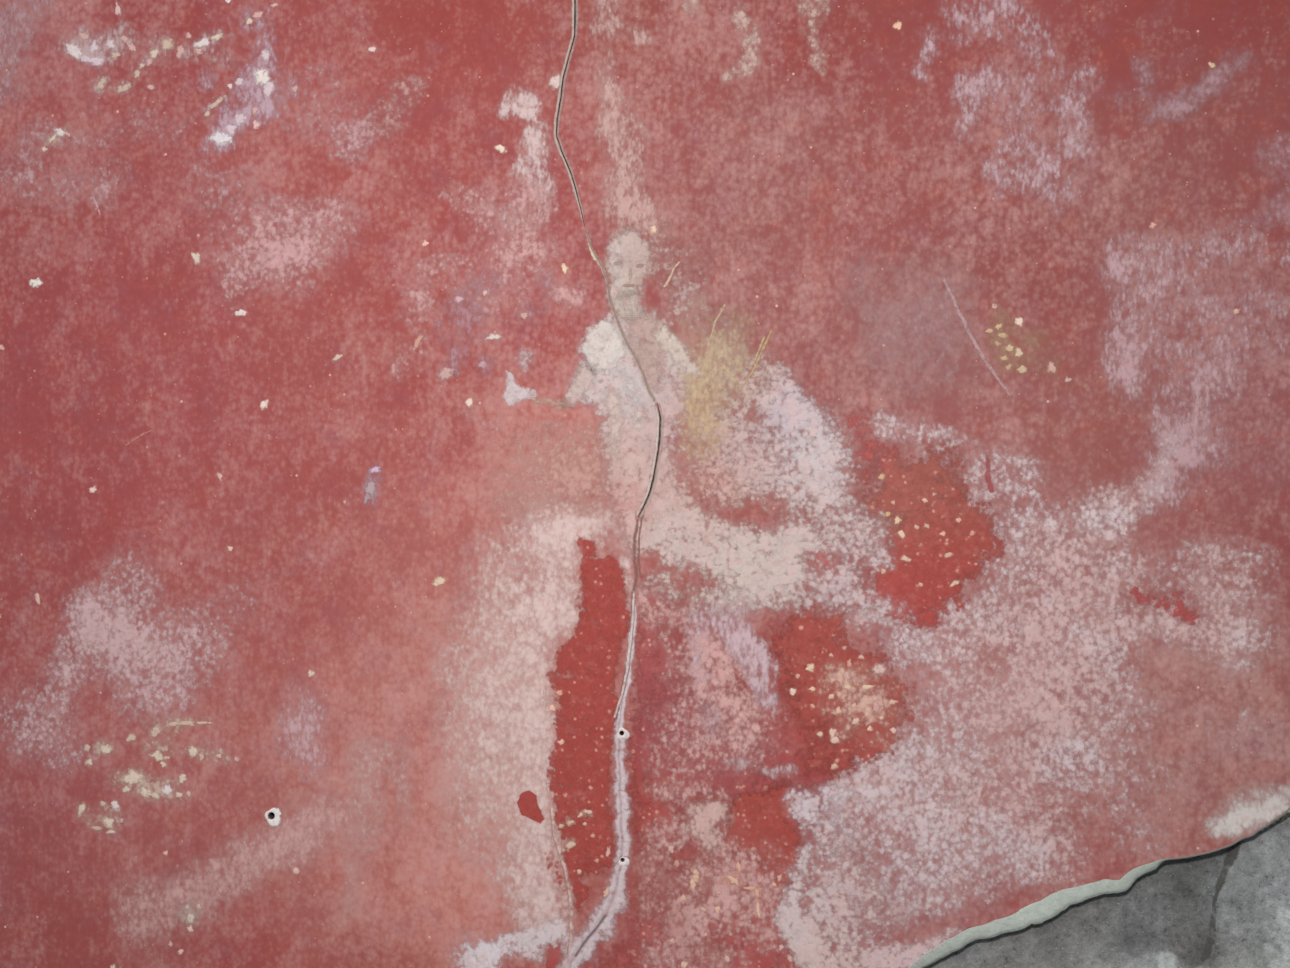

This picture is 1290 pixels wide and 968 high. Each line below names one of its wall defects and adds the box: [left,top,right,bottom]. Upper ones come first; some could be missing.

water stain [436,273,499,379]
water stain [1100,188,1290,514]
crack [547,0,664,968]
water stain [688,587,778,709]
flaking render [517,410,1290,968]
water stain [673,801,728,852]
water stain [728,758,797,779]
water stain [1206,787,1290,838]